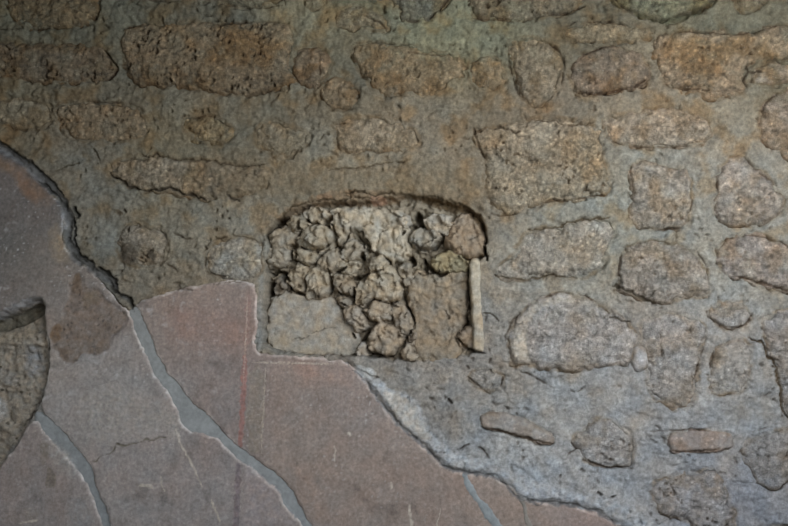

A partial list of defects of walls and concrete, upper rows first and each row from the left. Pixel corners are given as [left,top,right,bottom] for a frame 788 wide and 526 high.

spalling [276,187,406,227]
spalling [117,241,157,266]
spalling [0,272,127,469]